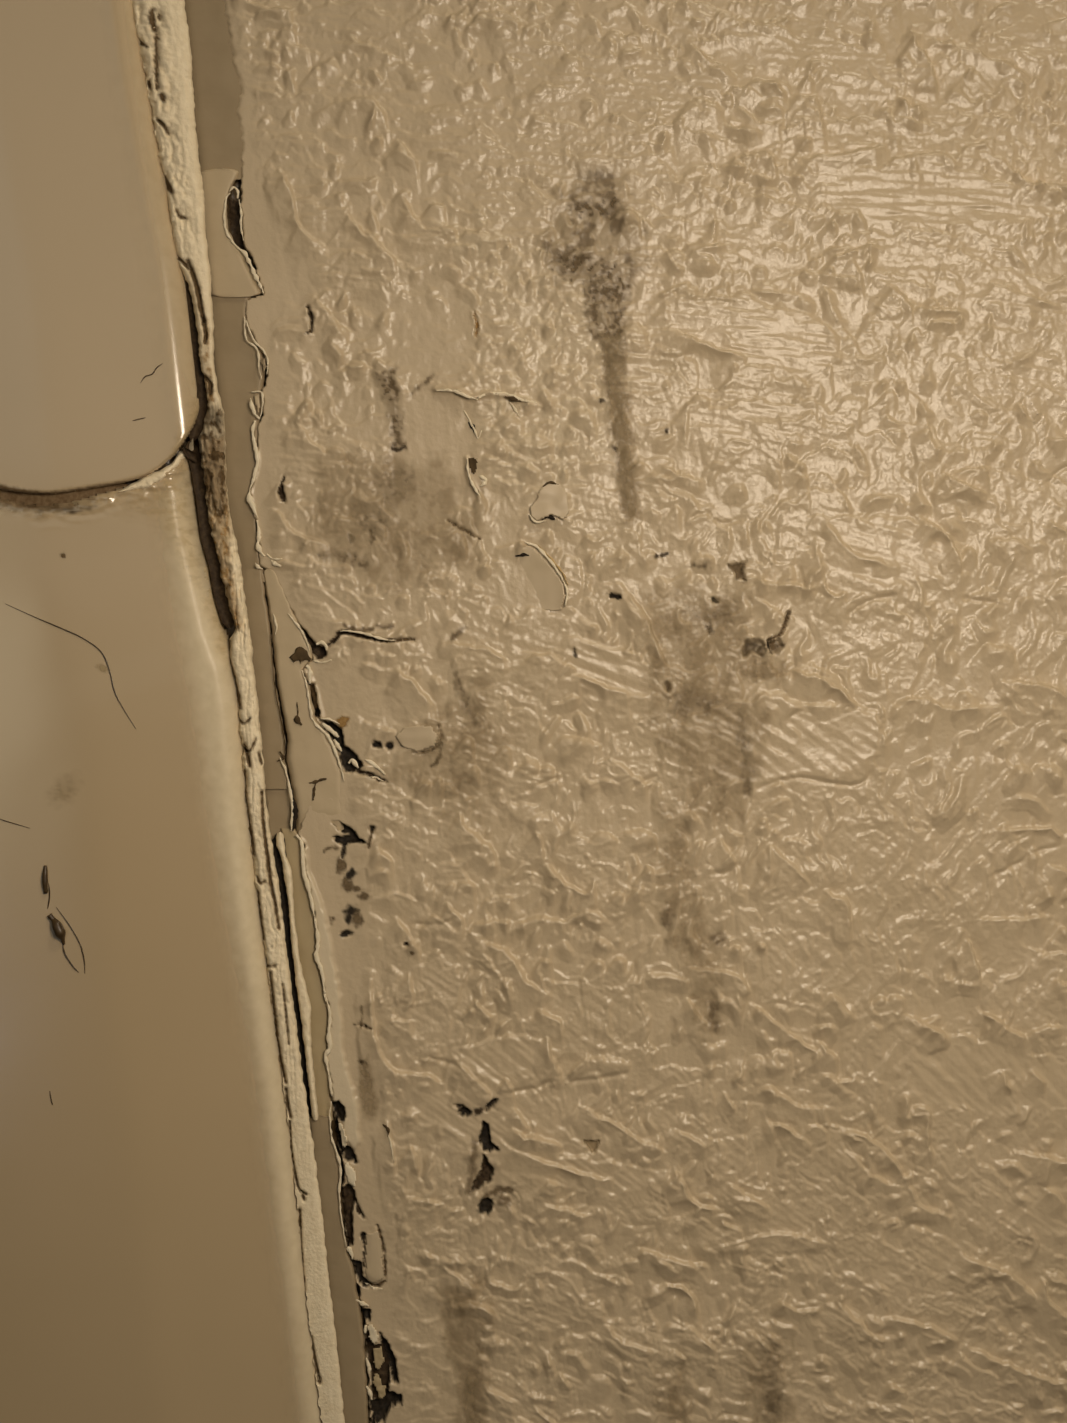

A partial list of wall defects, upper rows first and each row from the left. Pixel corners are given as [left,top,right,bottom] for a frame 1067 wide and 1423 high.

spalling [222,186,264,294]
water stain [548,178,636,517]
peeling [244,316,282,569]
spalling [273,613,386,800]
peeling [340,630,396,641]
spalling [334,824,365,846]
spalling [295,834,403,1423]